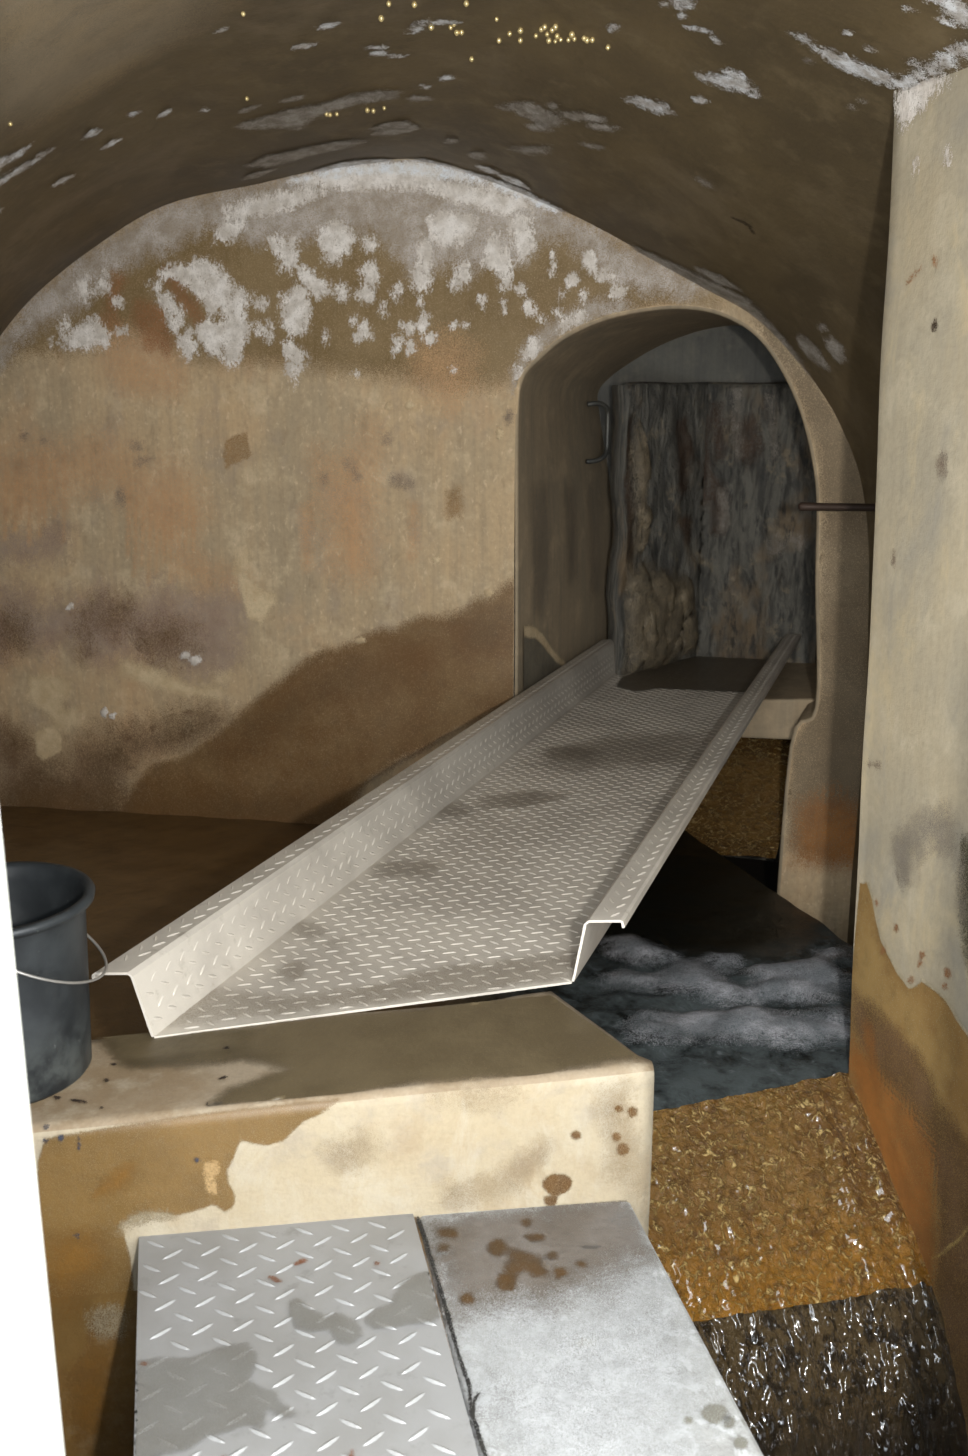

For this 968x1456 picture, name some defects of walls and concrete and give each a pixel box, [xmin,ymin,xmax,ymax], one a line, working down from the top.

damp [290,22,342,50]
damp [367,44,404,59]
damp [408,17,461,34]
damp [659,0,725,45]
damp [691,68,761,106]
damp [787,0,968,136]
damp [0,75,869,866]
damp [888,799,968,979]
peeling [193,1157,221,1196]